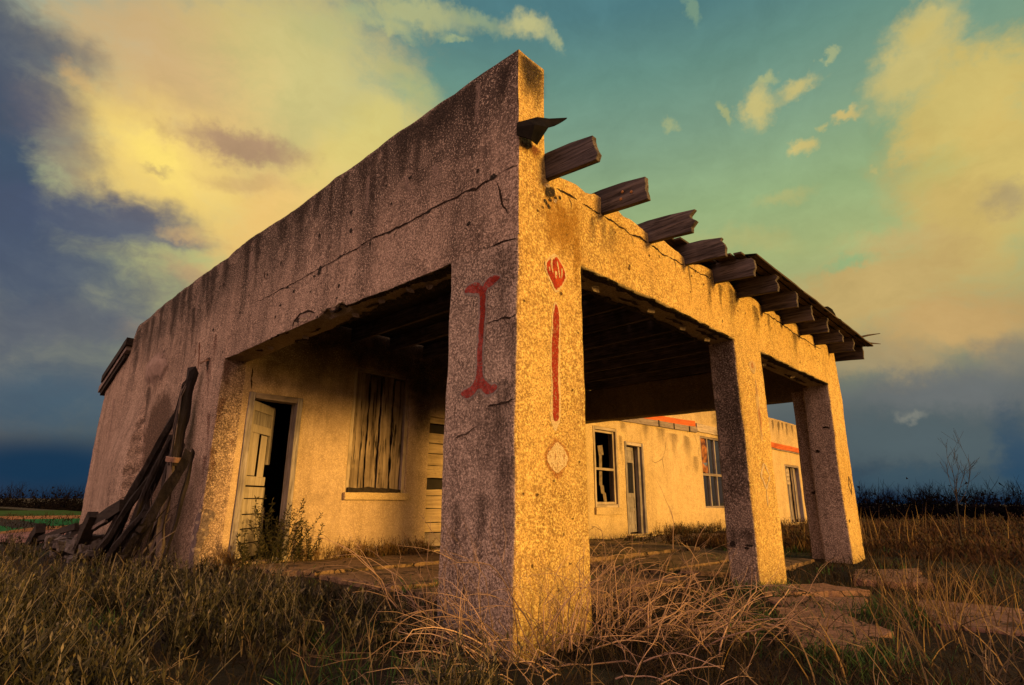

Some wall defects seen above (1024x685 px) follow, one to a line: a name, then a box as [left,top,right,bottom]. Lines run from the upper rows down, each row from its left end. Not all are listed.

damp [244,233,261,276]
damp [279,173,348,237]
crack [257,166,515,301]
crack [557,188,711,278]
damp [136,259,229,347]
crack [453,399,513,441]